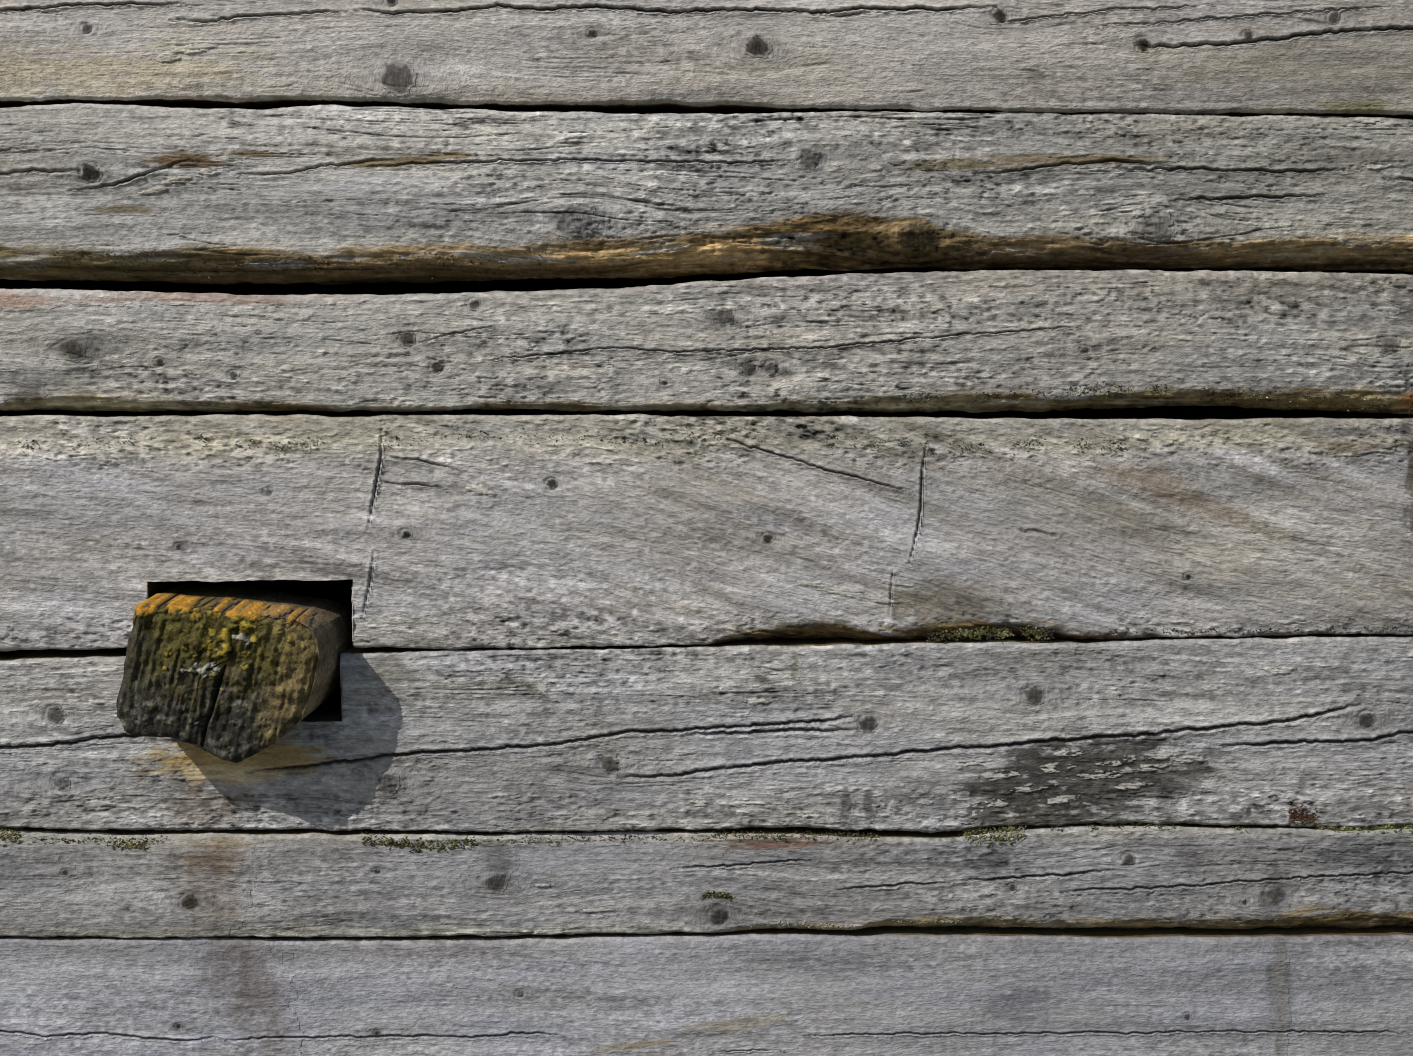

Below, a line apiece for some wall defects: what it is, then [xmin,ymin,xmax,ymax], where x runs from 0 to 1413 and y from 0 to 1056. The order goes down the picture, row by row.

crack [0,0,1413,49]
crack [0,146,195,192]
crack [234,157,794,177]
crack [974,157,1348,203]
crack [1382,176,1413,184]
crack [246,704,1413,780]
leakage [121,735,368,1056]